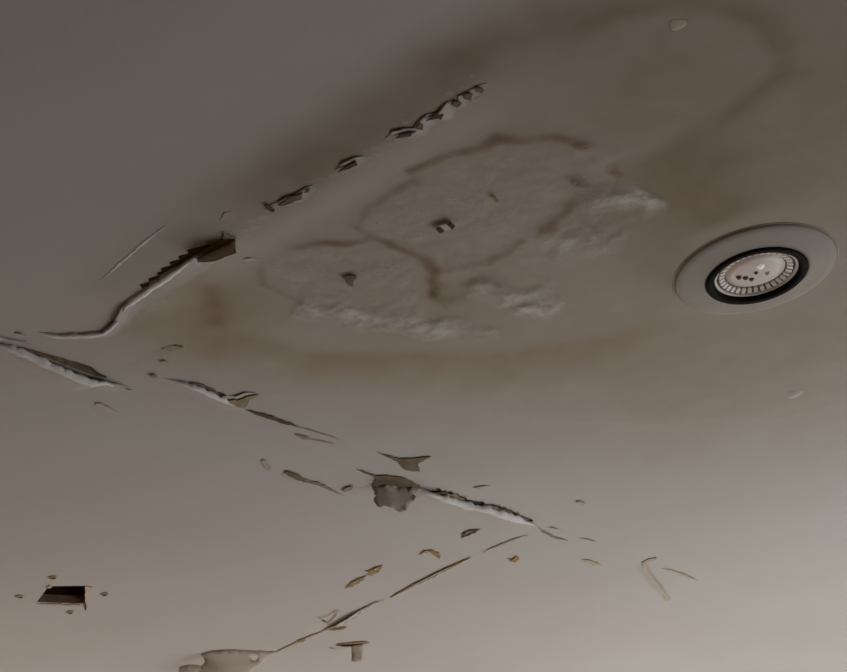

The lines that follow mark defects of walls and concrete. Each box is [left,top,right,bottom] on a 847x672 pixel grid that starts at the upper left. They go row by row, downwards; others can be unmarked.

crack [0,211,257,393]
crack [149,361,339,445]
peeling [357,452,431,513]
crack [278,487,595,652]
peeling [178,650,277,672]
peeling [329,641,370,663]